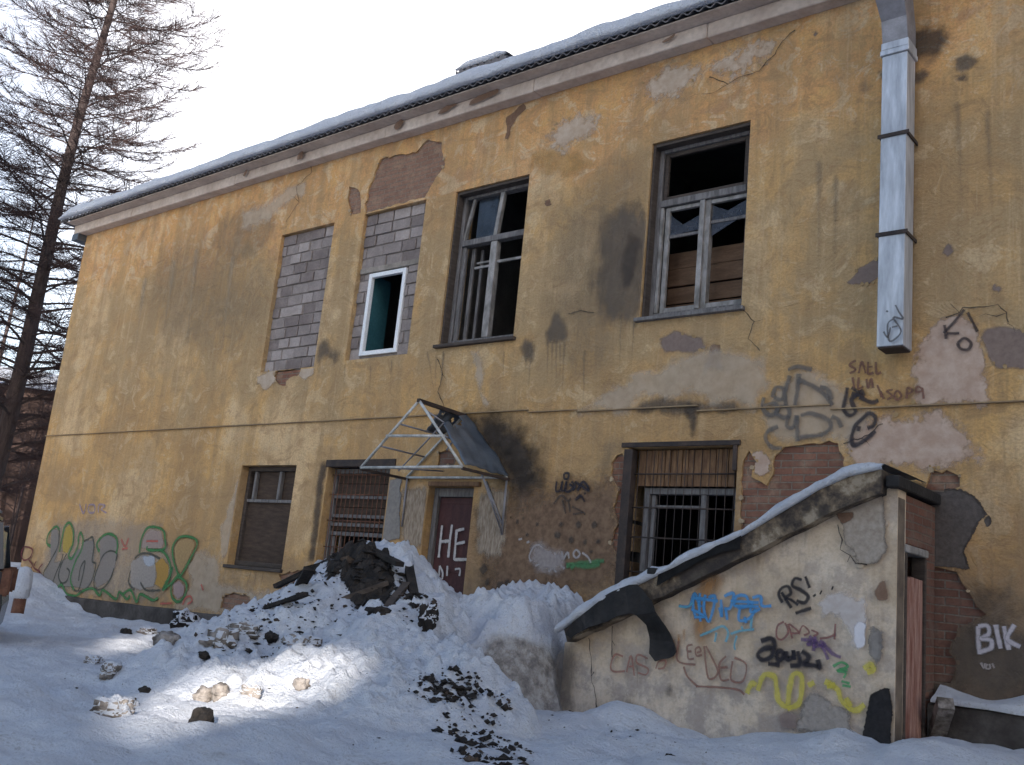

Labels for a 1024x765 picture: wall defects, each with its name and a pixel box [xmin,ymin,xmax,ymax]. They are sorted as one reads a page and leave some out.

peeling [642,65,700,99]
crack [695,30,795,95]
leakage [957,55,977,80]
peeling [550,115,600,154]
spalling [348,140,445,216]
leakage [598,209,646,320]
spalling [256,368,314,391]
leakage [522,341,533,358]
leakage [547,314,566,342]
peeling [738,315,1024,529]
spalling [837,496,889,569]
spalling [934,567,986,685]